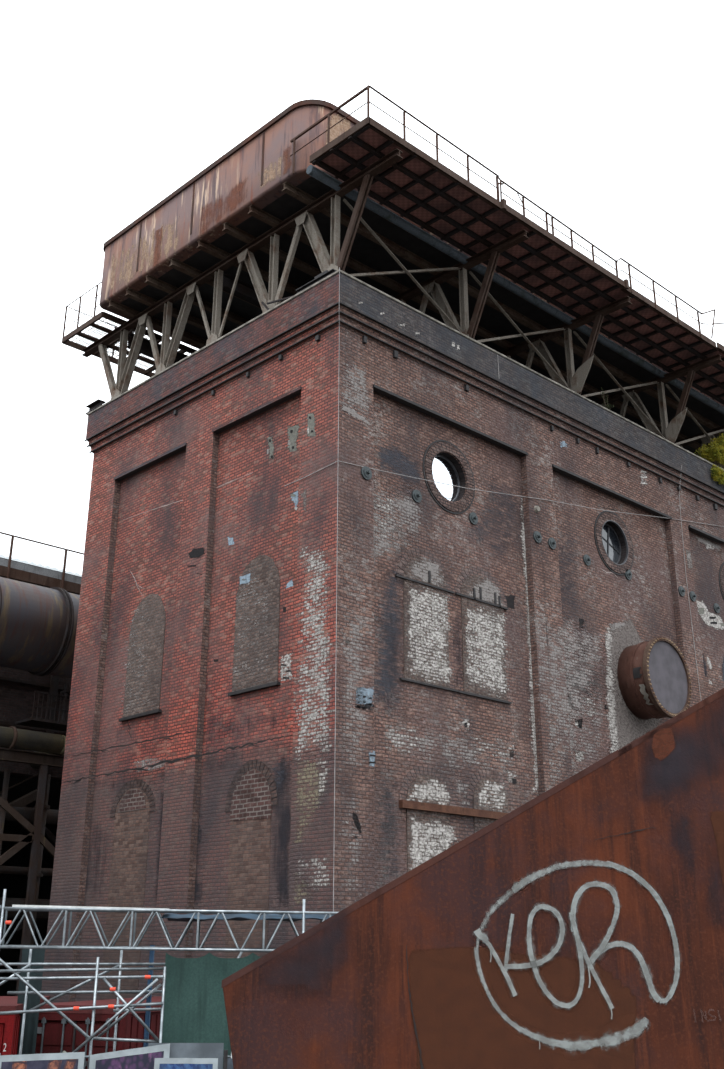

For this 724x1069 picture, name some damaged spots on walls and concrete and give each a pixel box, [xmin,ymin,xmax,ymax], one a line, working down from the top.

corrosion [200,182,245,234]
crack [65,721,291,784]
water stain [273,546,370,897]
corrosion [652,728,675,761]
corrosion [409,947,637,1069]